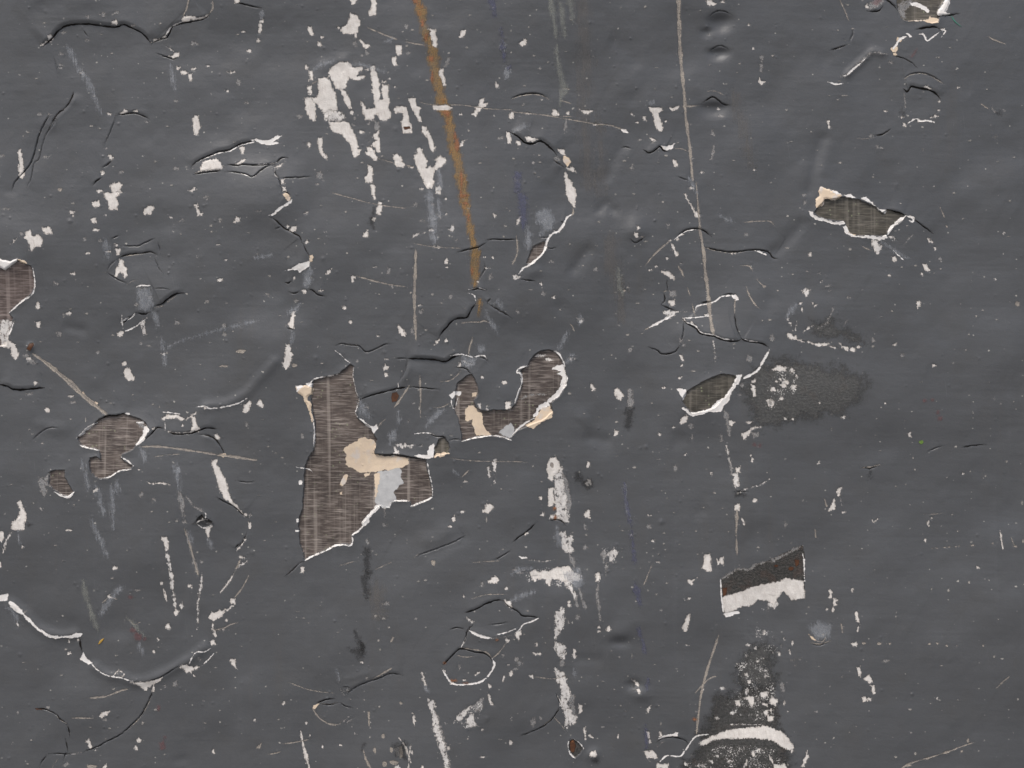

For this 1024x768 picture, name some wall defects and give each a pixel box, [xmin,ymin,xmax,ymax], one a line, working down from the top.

peeling [0,226,59,365]
crack [0,0,214,200]
peeling [297,0,456,241]
corrosion [413,0,481,286]
crack [645,203,785,358]
peeling [802,182,942,275]
peeling [38,386,258,653]
peeling [282,304,575,591]
crack [415,493,578,658]
peeling [662,334,797,525]
peeling [688,545,805,617]